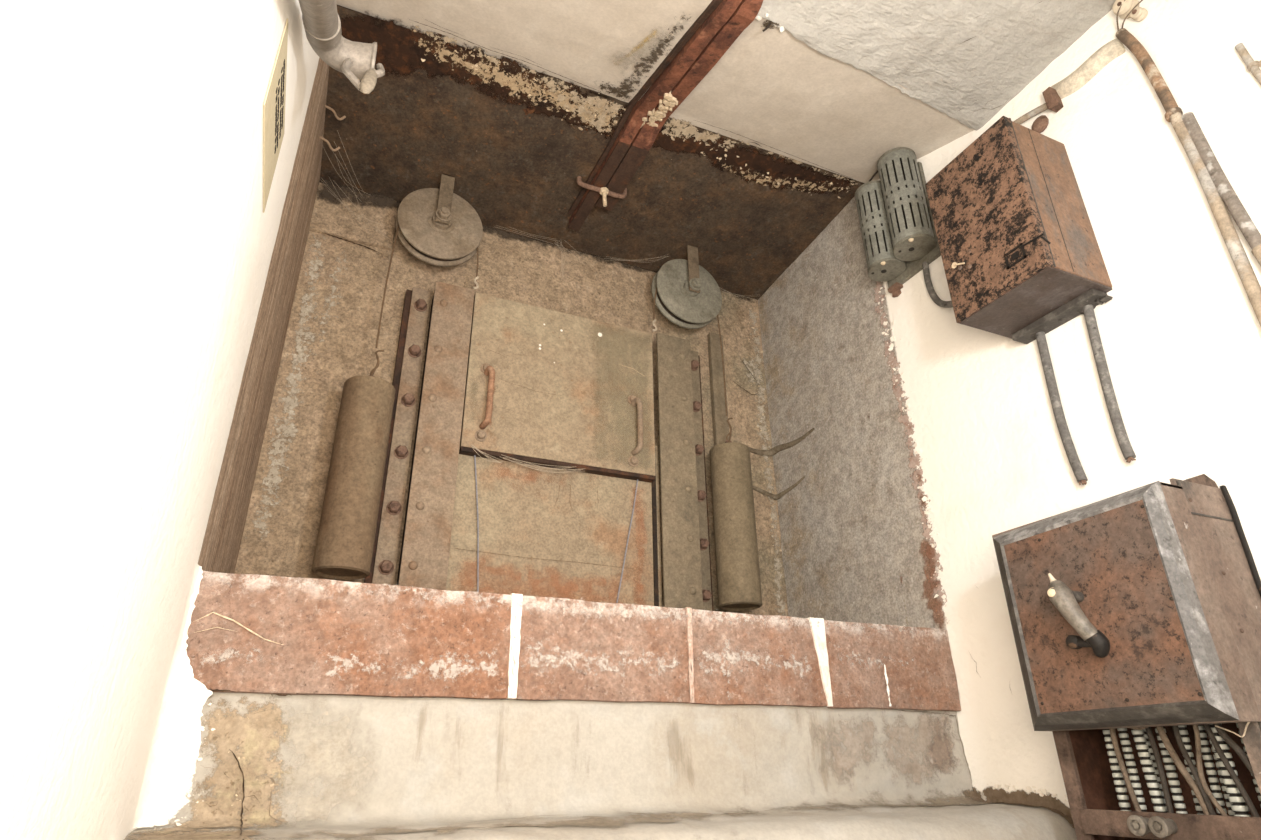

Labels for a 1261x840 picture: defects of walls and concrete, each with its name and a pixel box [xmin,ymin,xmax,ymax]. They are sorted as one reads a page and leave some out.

flaking render [755,13,785,32]
peeling [341,12,627,139]
peeling [653,118,858,198]
rust [919,540,944,628]
flaking render [129,694,369,840]
crack [229,749,282,840]